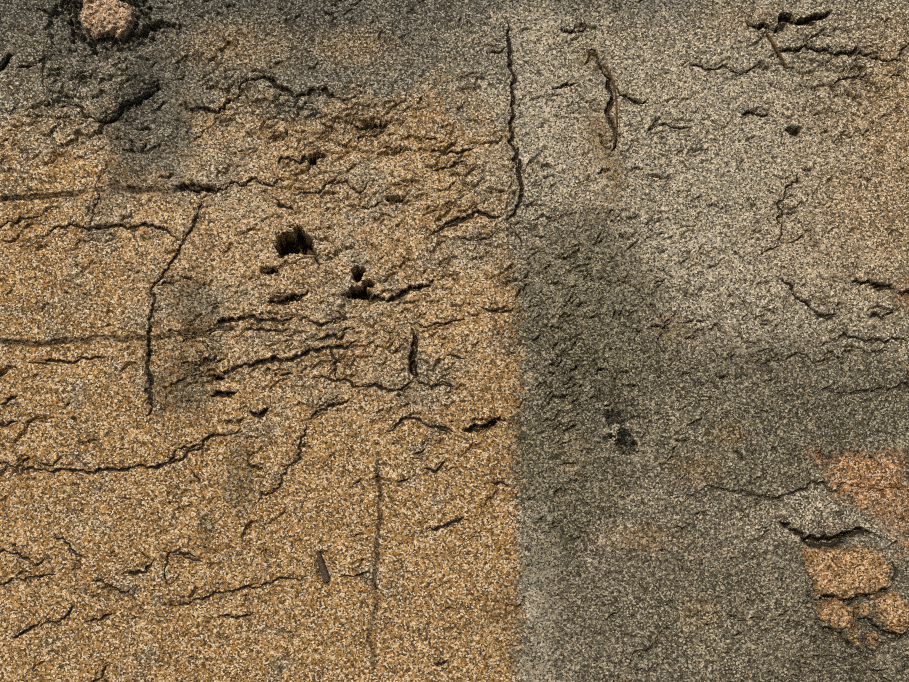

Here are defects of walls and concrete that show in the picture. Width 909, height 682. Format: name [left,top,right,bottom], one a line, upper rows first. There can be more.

crack [684,13,909,85]
crack [0,50,161,126]
crack [186,76,348,115]
crack [321,120,475,172]
crack [429,23,524,246]
crack [0,152,381,416]
crack [184,280,518,506]
crack [0,408,269,482]
crack [0,532,87,585]
crack [11,548,307,639]
crack [428,517,468,531]
peeling [801,544,909,653]